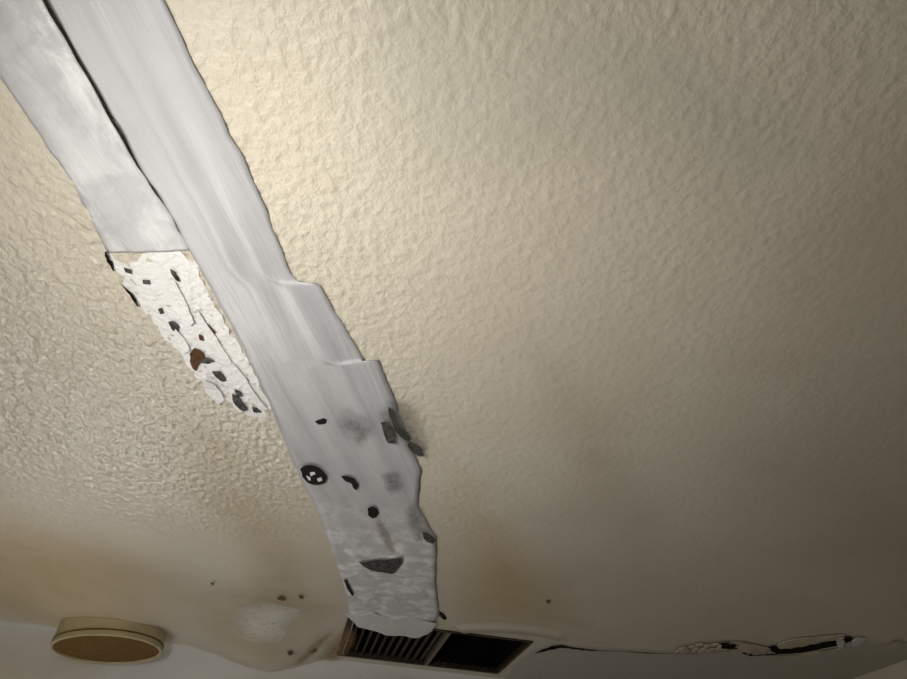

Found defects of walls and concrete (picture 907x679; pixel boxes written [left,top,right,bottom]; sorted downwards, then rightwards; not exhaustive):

peeling [105,251,271,418]
water stain [368,507,390,547]
water stain [359,558,403,574]
crack [536,645,667,654]